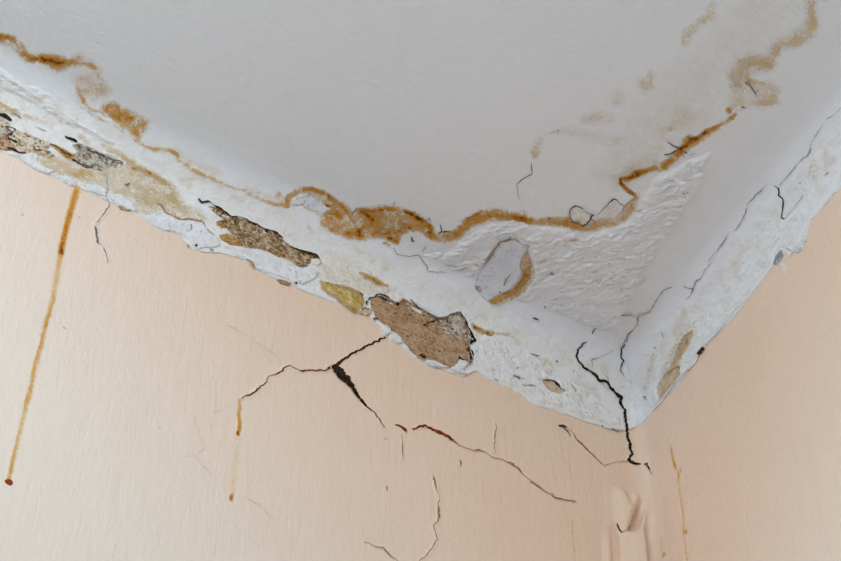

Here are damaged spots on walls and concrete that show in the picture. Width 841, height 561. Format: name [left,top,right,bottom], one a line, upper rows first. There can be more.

corrosion [5,186,79,485]
peeling [0,67,123,172]
water stain [0,33,221,183]
water stain [40,145,202,218]
peeling [0,113,621,426]
water stain [360,272,388,287]
crack [185,324,577,504]
crack [385,218,511,273]
water stain [230,108,737,246]
peeling [423,151,714,334]
crack [548,110,839,475]
peeling [643,206,811,413]